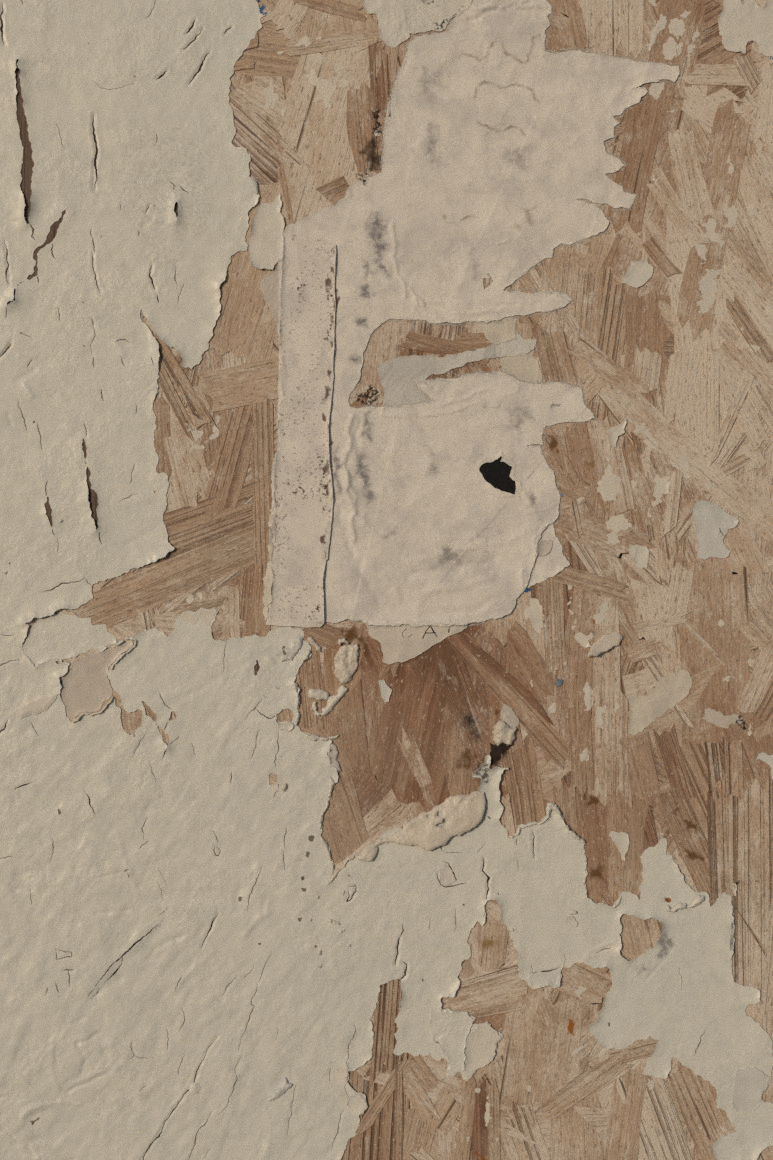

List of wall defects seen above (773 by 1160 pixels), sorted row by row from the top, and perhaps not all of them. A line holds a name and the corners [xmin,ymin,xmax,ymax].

crack [92,19,231,185]
crack [0,0,66,368]
crack [120,183,188,236]
crack [149,265,183,303]
crack [90,321,153,400]
peeling [23,0,456,745]
crack [44,482,59,552]
crack [82,425,135,544]
peeling [276,0,773,1160]